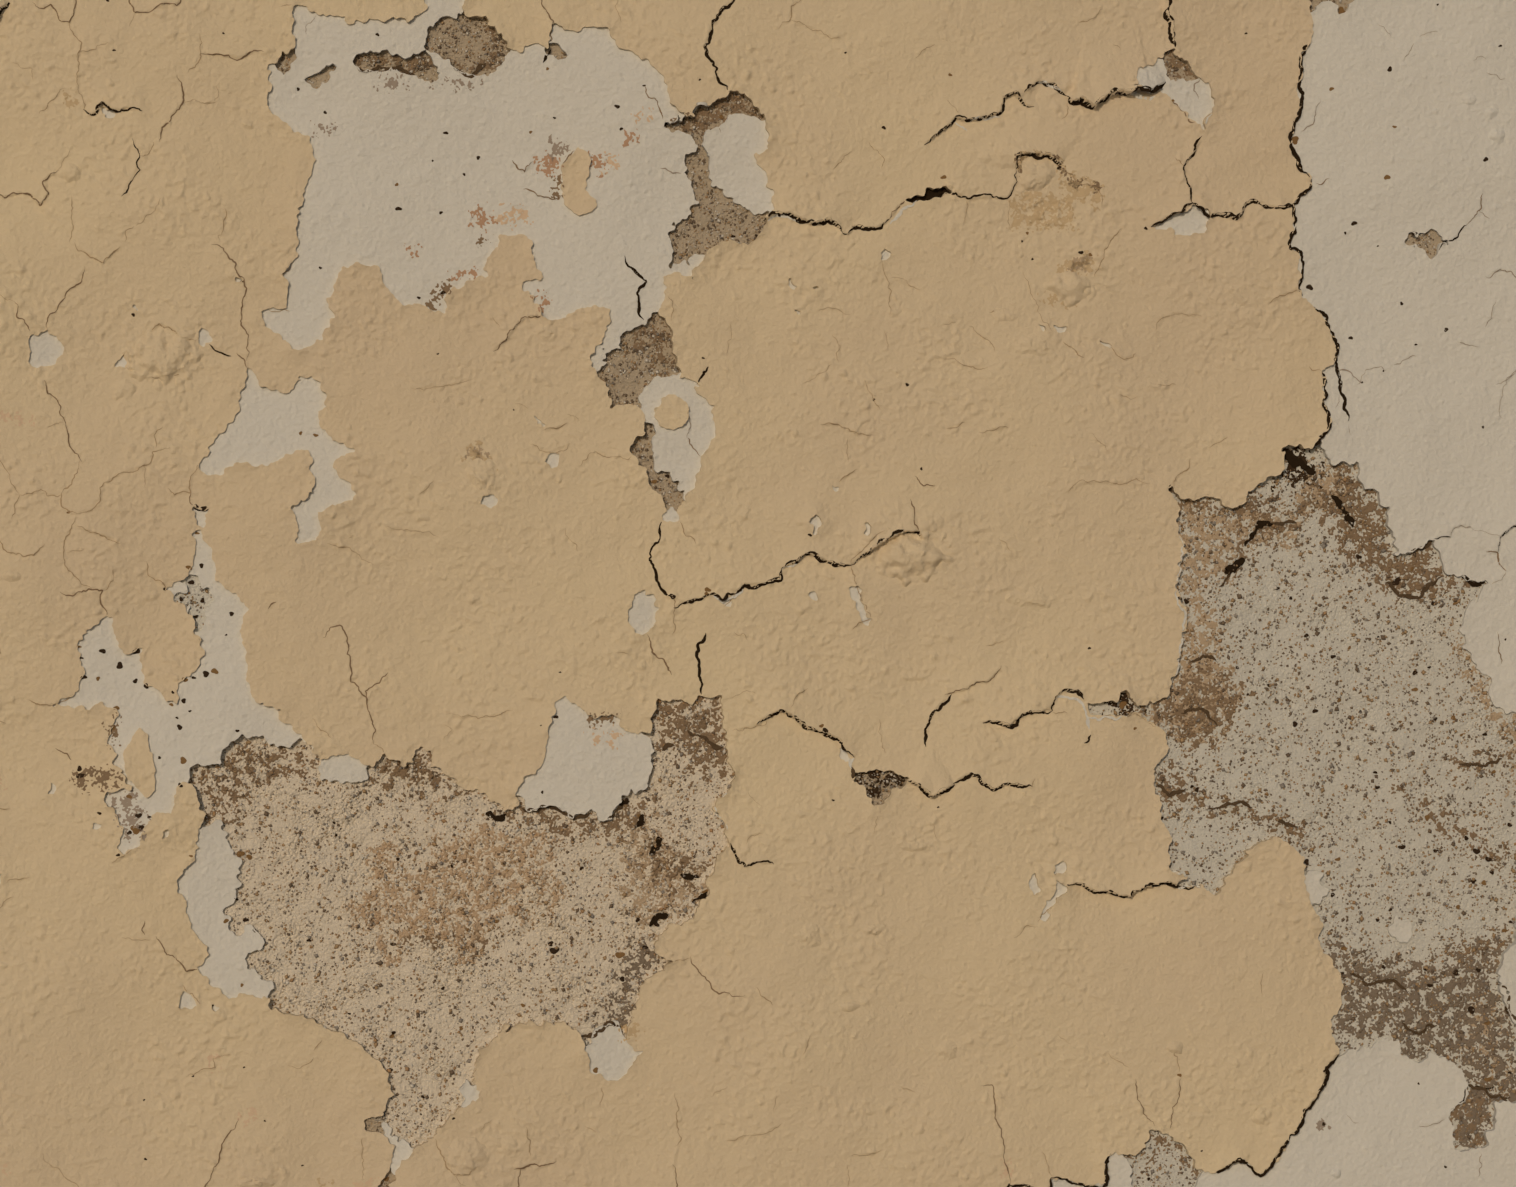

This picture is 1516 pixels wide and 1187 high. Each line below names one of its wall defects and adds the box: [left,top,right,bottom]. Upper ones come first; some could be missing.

crack [1163,0,1177,47]
peeling [262,0,774,522]
crack [763,44,1414,527]
peeling [199,368,356,544]
crack [687,324,732,456]
crack [1219,520,1296,587]
peeling [1051,0,1516,1187]
crack [924,641,1002,747]
crack [984,689,1091,743]
spalling [53,504,735,1187]
crack [909,772,1035,837]
peeling [1029,861,1069,921]